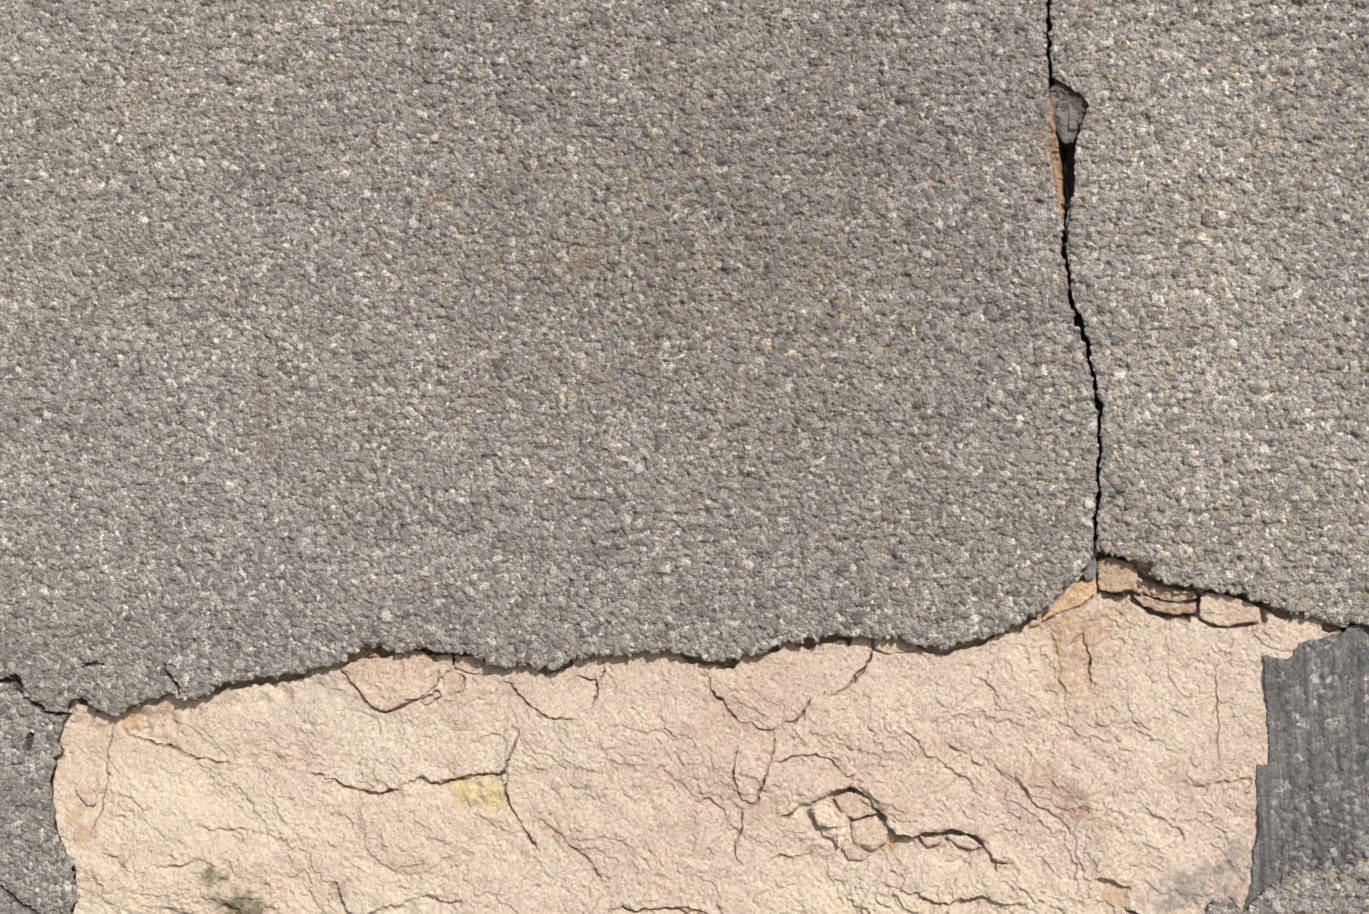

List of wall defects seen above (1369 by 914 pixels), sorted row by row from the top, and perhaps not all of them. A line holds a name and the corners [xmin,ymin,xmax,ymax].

crack [1045,0,1103,549]
crack [0,674,73,717]
crack [306,659,708,914]
spalling [50,547,1369,914]
crack [701,642,875,866]
crack [918,894,984,906]